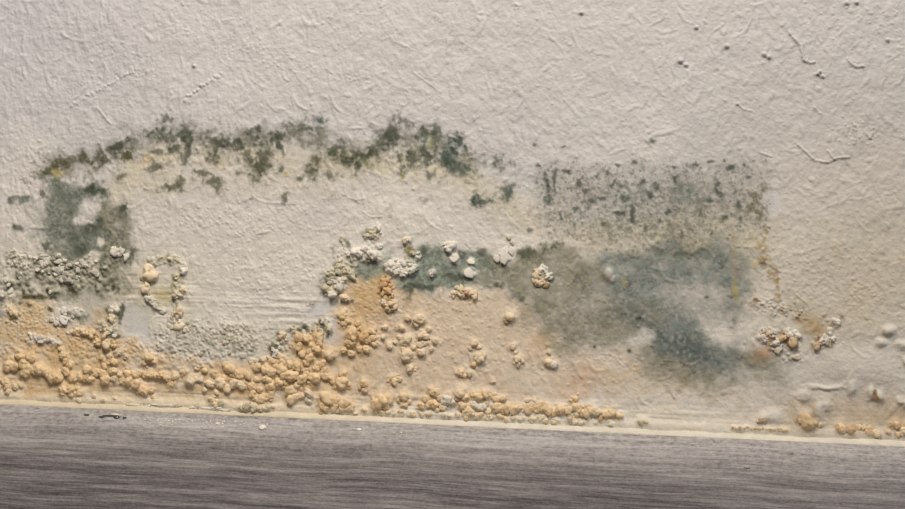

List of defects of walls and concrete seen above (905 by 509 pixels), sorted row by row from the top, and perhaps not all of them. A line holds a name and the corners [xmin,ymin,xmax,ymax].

damp [0,99,905,441]